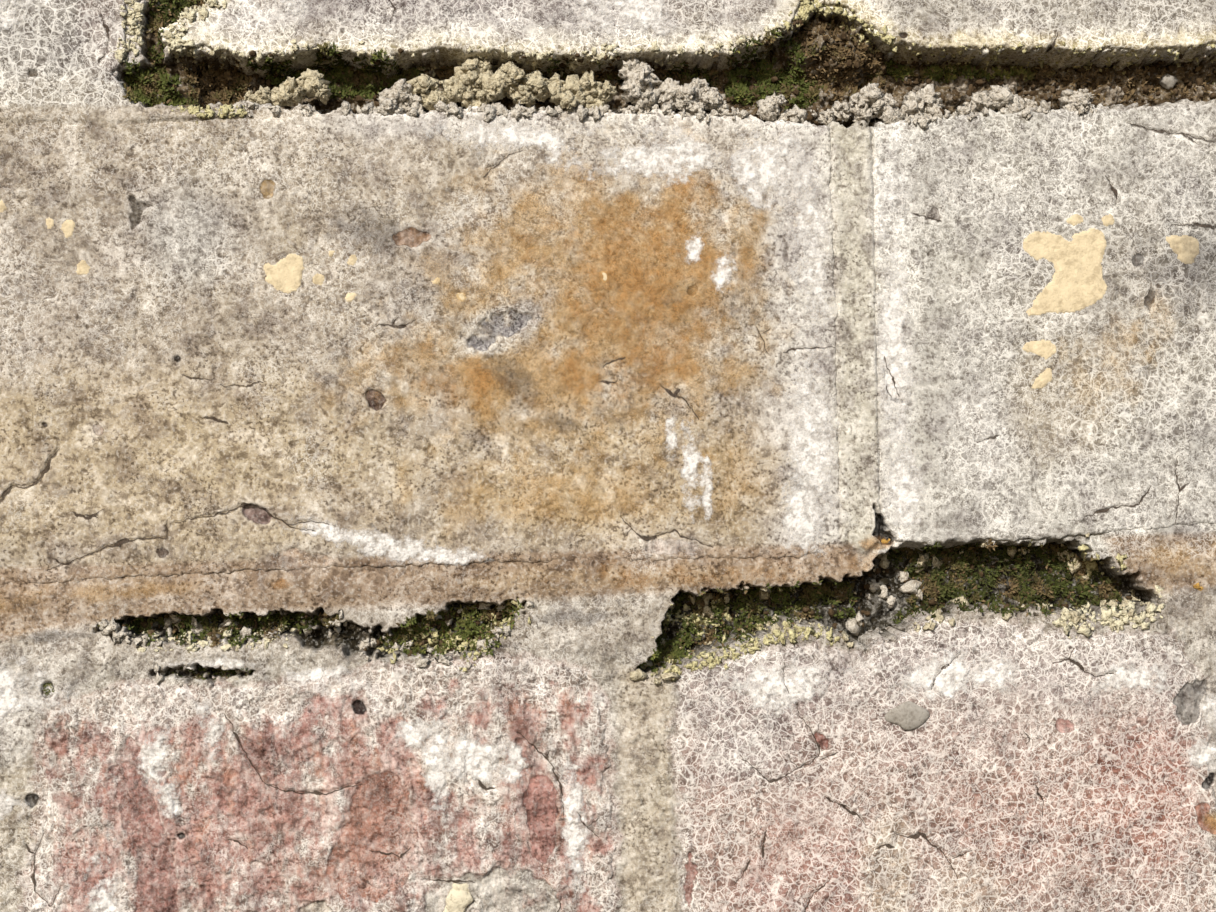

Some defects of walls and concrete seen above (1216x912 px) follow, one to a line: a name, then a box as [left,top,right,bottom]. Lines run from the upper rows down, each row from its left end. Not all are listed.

crack [1128,123,1216,144]
spalling [468,310,531,351]
crack [0,448,60,501]
crack [1086,456,1189,523]
crack [47,502,330,571]
spalling [646,538,701,555]